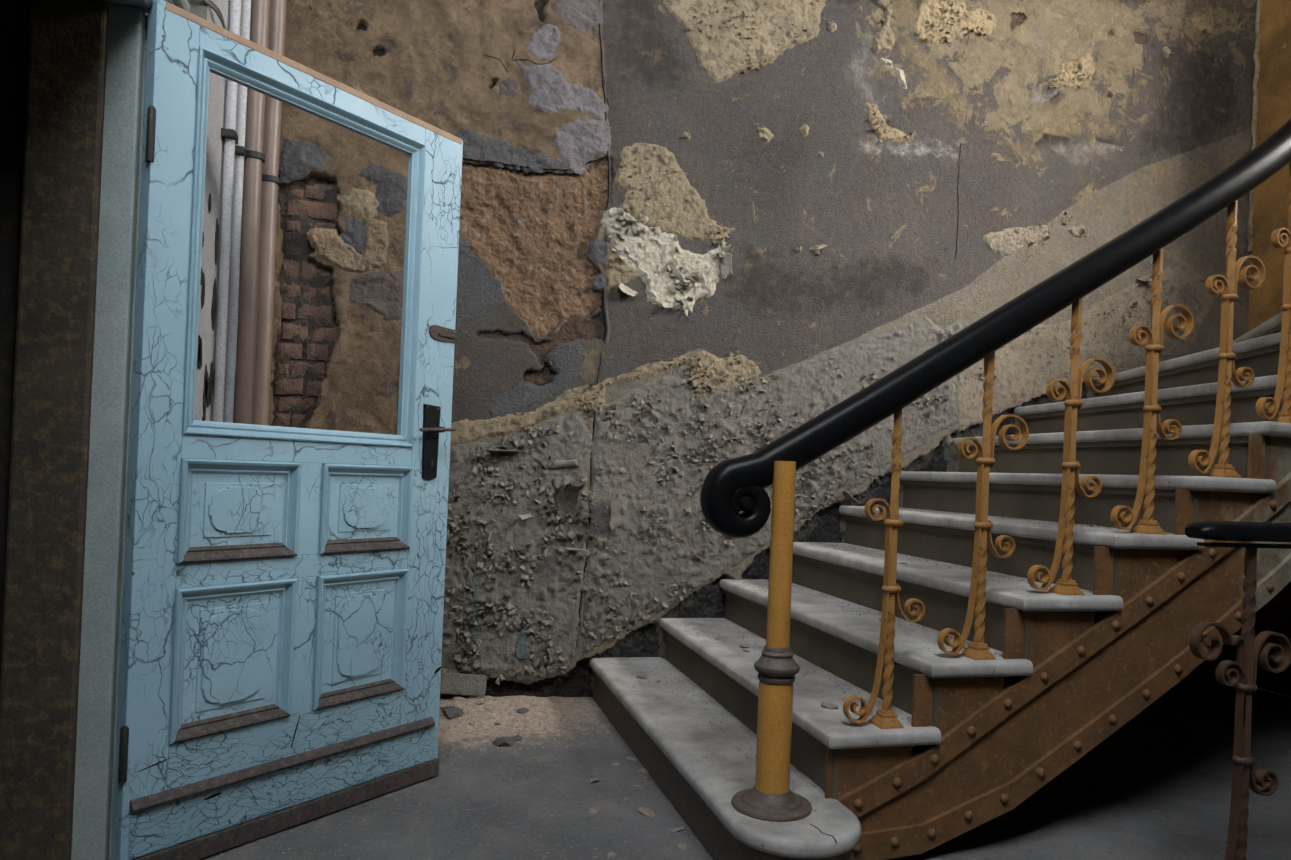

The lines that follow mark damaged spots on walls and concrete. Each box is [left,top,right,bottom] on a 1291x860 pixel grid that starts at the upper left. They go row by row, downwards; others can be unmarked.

flaking render [534,0,547,22]
peeling [663,0,827,83]
peeling [912,0,1025,45]
peeling [1039,53,1094,91]
peeling [983,209,1089,257]
flaking render [271,174,340,428]
peeling [434,142,969,697]